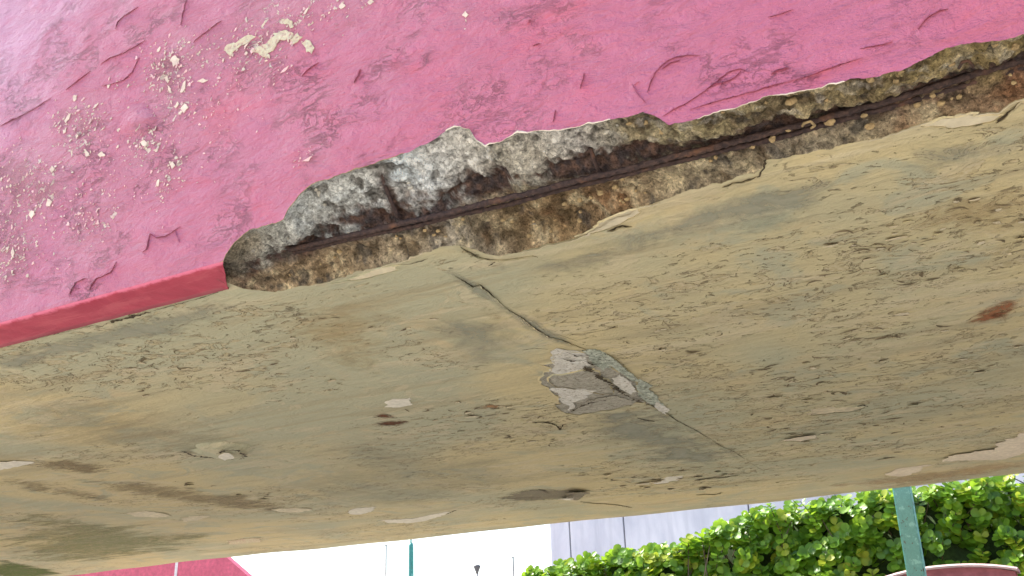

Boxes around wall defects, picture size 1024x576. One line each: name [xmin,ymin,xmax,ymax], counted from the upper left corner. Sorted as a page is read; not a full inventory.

spalling [221,34,1024,292]
crack [455,248,586,350]
corrosion [969,301,1014,322]
peeling [384,348,670,443]
crack [535,422,567,430]
crack [636,399,760,495]
peeling [751,352,1024,476]